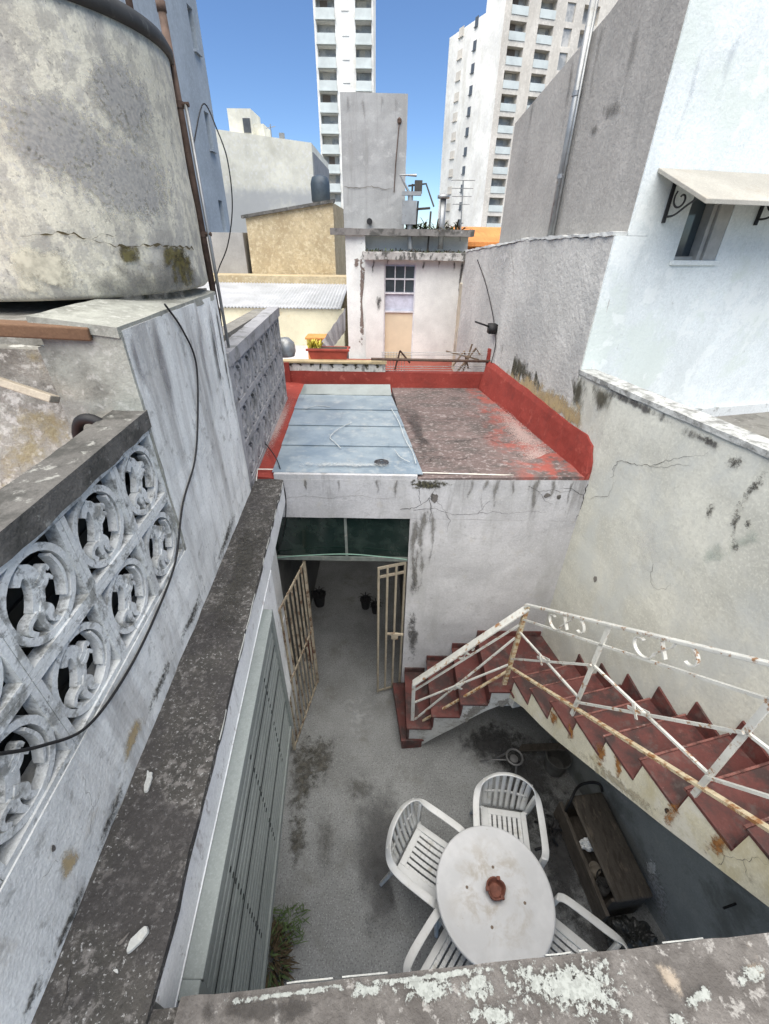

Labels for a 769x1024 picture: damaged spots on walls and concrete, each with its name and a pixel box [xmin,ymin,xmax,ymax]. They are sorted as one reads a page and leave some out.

crack [30,231,194,250]
water stain [107,252,196,301]
peeling [493,403,552,463]
crack [345,414,704,528]
water stain [730,477,763,528]
water stain [411,514,435,590]
corrosion [597,744,622,777]
water stain [291,740,331,863]
corrosion [708,836,725,855]
peeling [224,955,634,1024]
peeling [669,986,711,1024]
peeling [738,965,765,986]